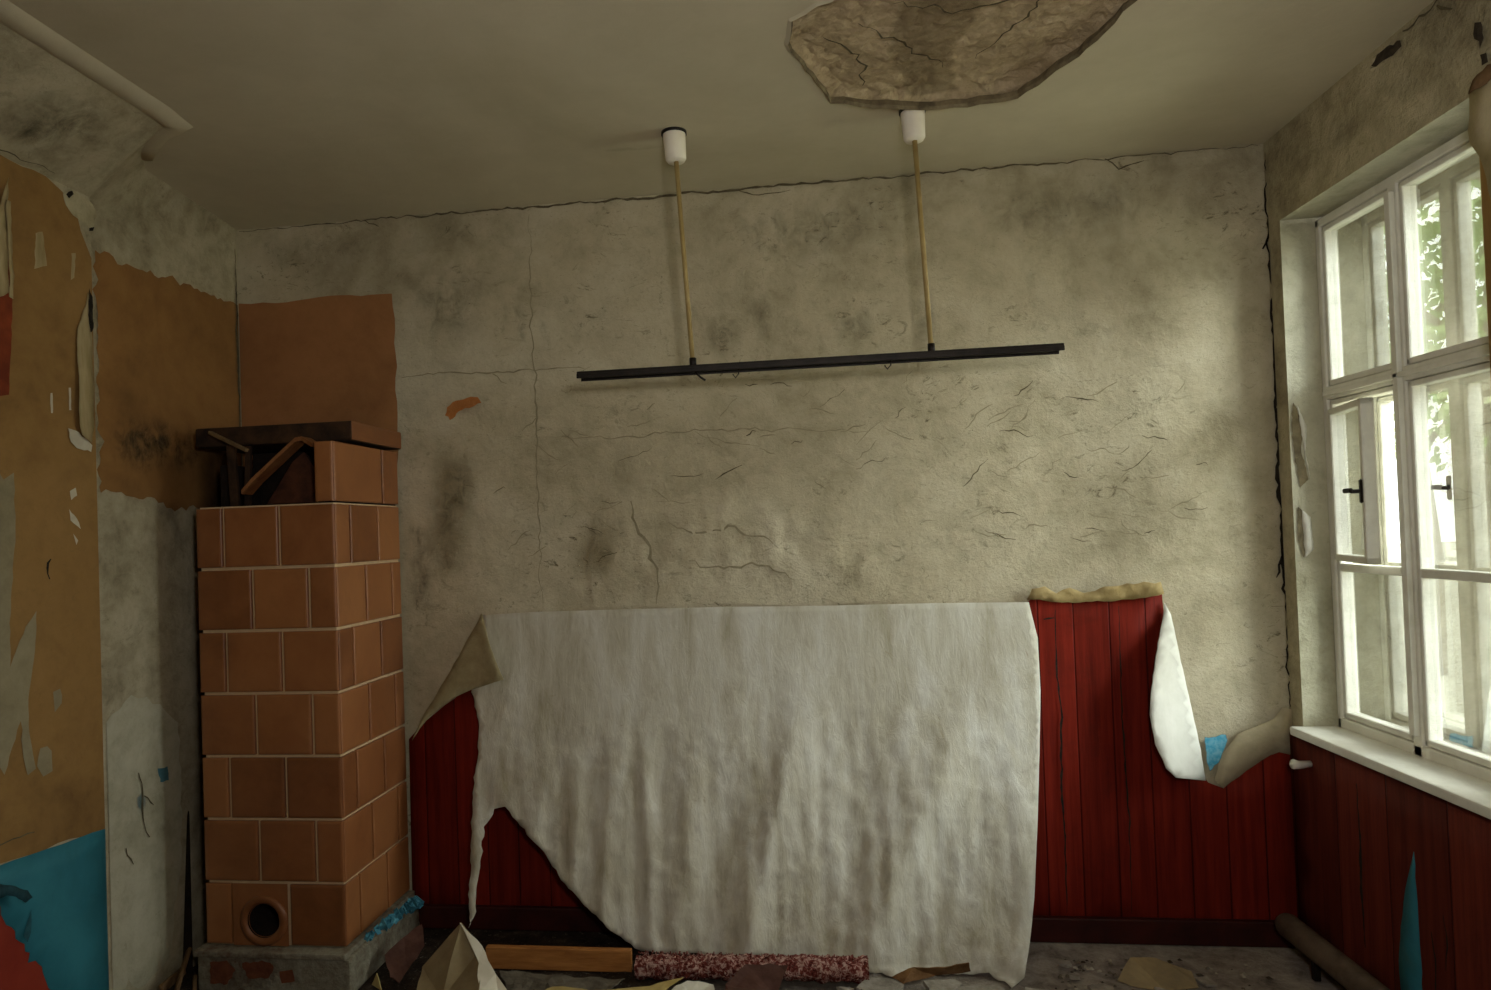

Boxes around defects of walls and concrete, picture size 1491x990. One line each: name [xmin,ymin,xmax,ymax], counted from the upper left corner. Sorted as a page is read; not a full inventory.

crack [1403,0,1452,32]
peeling [1468,19,1491,199]
spalling [63,190,97,231]
peeling [0,178,15,396]
peeling [69,488,81,545]
peeling [0,473,53,776]
peeling [1205,734,1227,771]
peeling [0,884,32,942]